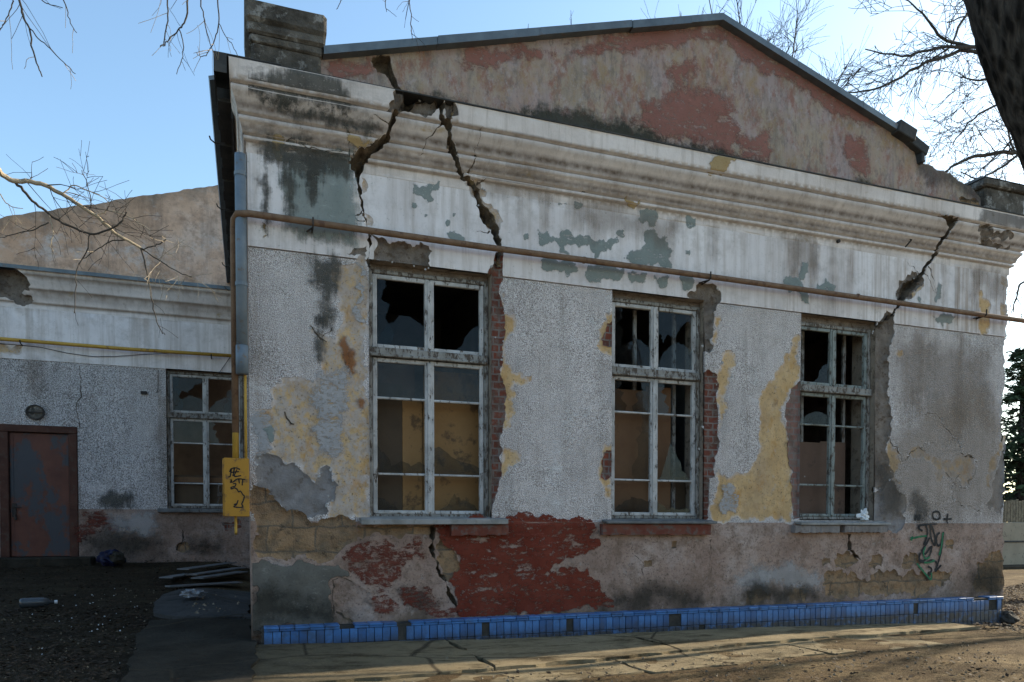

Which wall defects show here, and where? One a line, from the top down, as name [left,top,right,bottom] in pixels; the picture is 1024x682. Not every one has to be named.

peeling [463,42,543,71]
peeling [573,26,875,177]
water stain [257,134,356,232]
crack [286,55,501,267]
water stain [311,254,341,361]
crack [874,214,959,330]
peeling [249,153,614,624]
peeling [524,209,805,525]
crack [428,525,458,615]
flaking render [822,551,952,599]